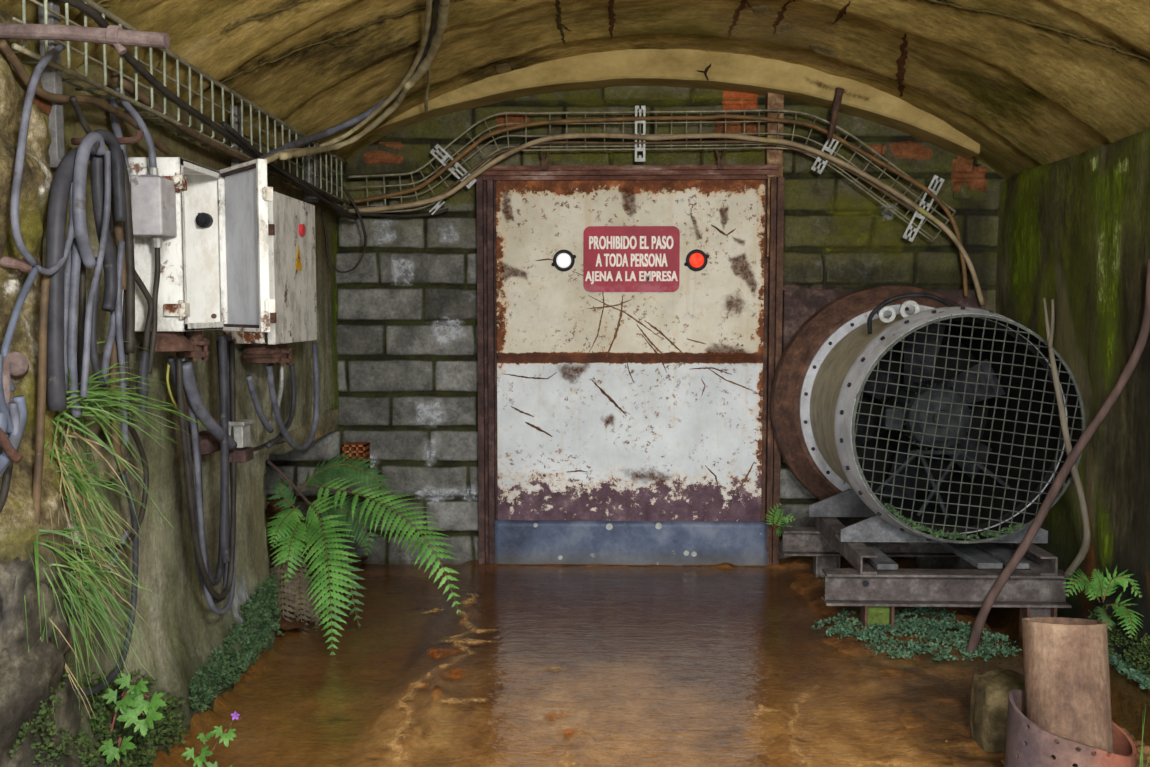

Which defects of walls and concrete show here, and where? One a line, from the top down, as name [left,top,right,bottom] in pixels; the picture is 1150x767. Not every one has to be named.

crack [554,0,570,45]
crack [727,0,795,38]
crack [204,0,456,91]
crack [697,63,711,80]
spalling [951,156,988,192]
corrosion [503,191,513,220]
corrosion [623,189,636,215]
corrosion [502,264,526,279]
corrosion [731,238,757,292]
water stain [1098,227,1120,302]
water stain [434,320,461,343]
corrosion [705,344,756,363]